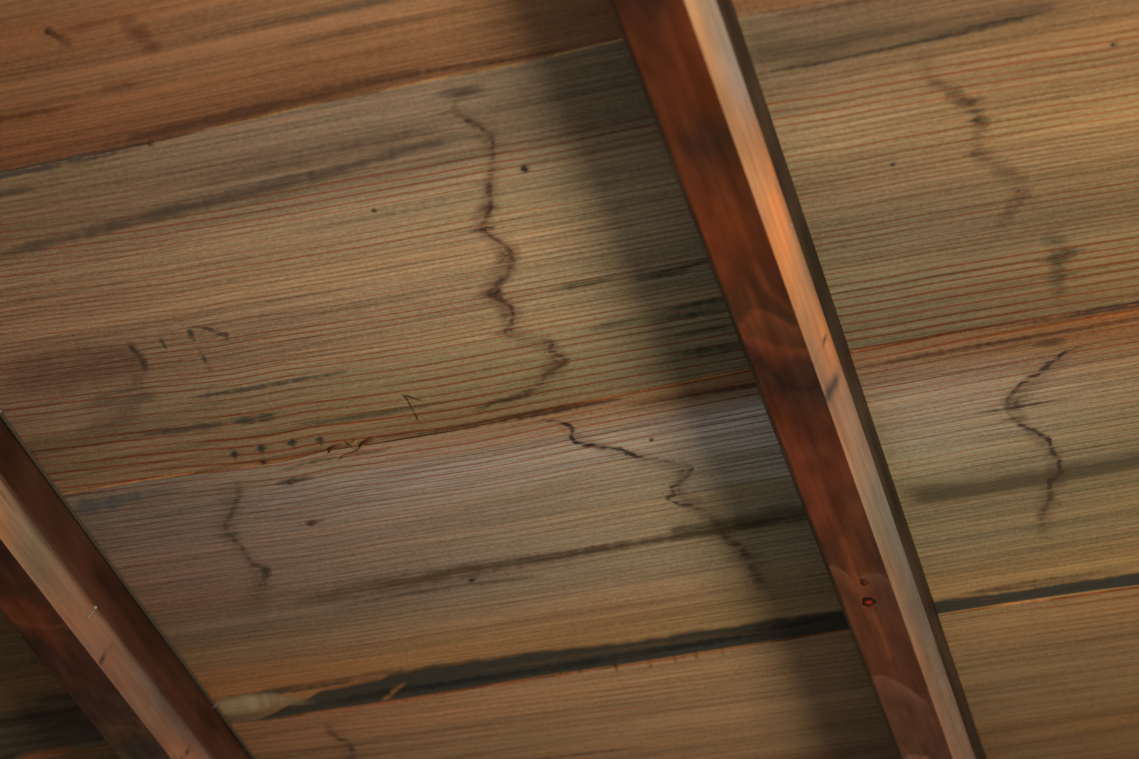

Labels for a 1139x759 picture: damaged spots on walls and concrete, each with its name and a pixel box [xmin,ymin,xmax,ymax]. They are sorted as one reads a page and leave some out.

water stain [474,183,515,330]
water stain [917,301,1139,501]